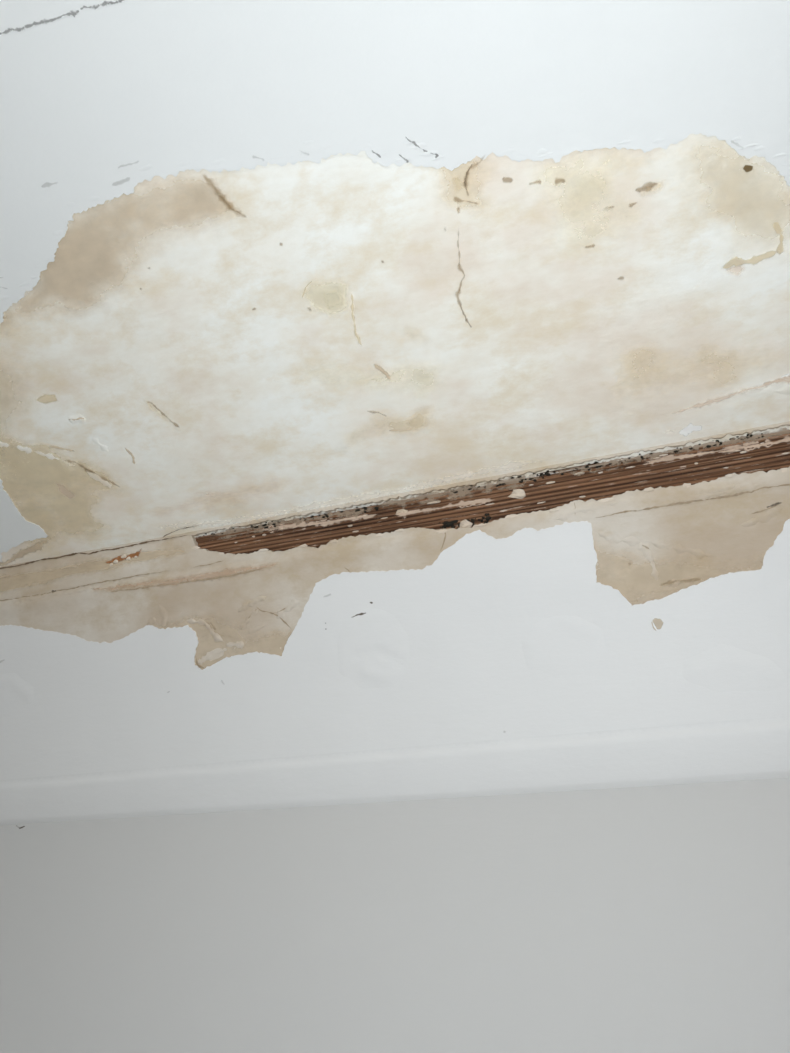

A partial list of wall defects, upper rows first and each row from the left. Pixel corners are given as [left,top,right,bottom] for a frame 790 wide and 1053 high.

crack [0,0,122,34]
water stain [25,178,232,307]
water stain [724,223,783,268]
peeling [0,133,790,665]
water stain [450,453,653,494]
water stain [0,445,181,591]
mould [438,513,491,529]